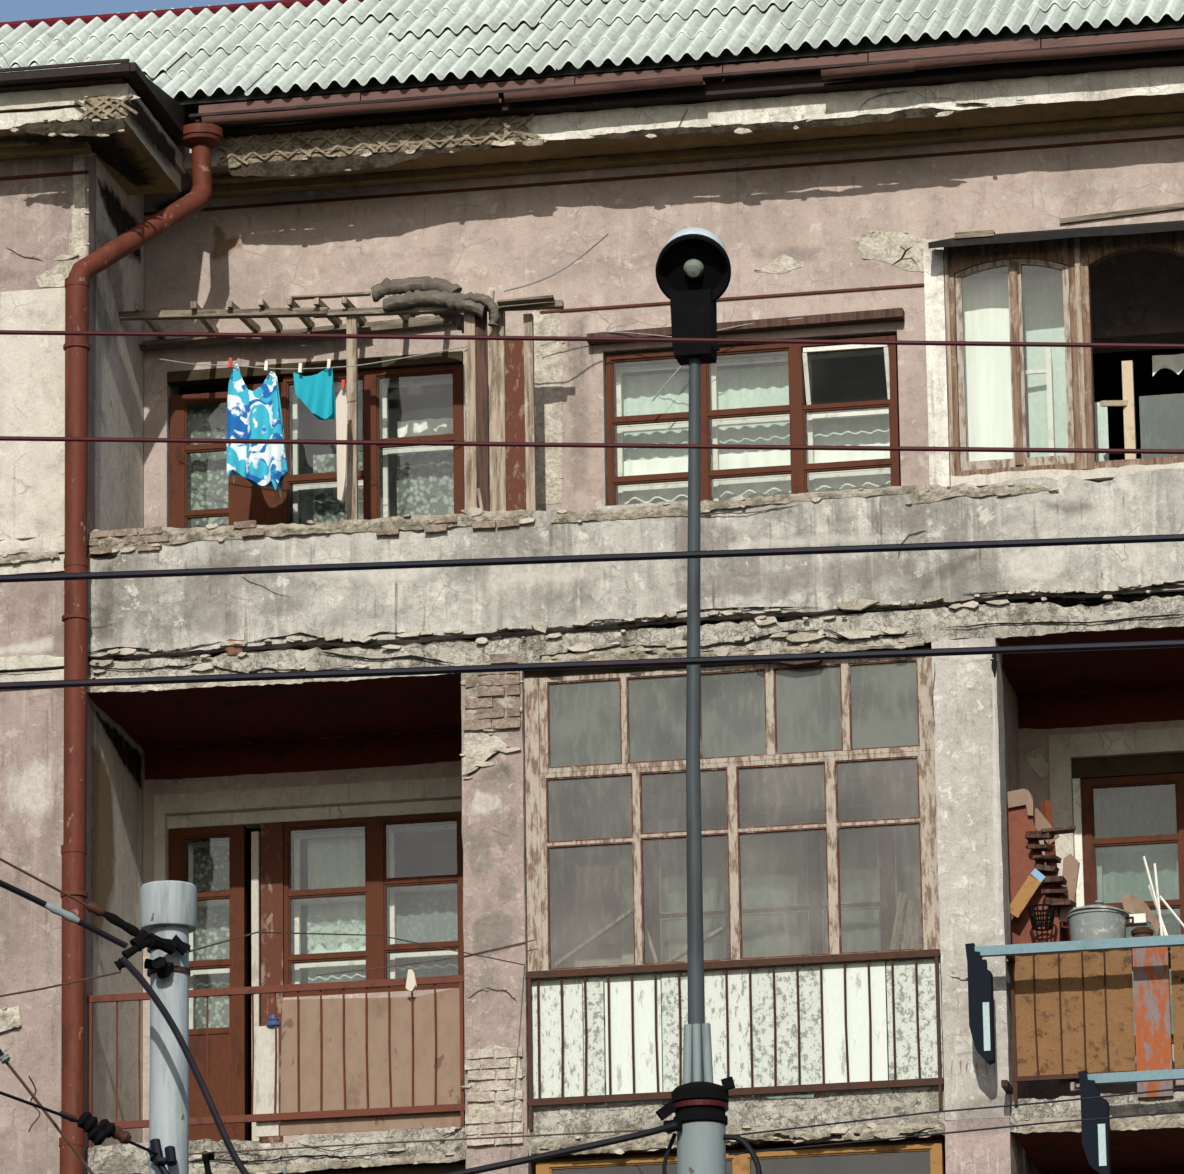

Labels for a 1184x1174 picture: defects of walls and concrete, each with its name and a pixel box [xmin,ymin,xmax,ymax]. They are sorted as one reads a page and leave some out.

spalling [590,106,961,139]
flaking render [217,113,548,177]
peeling [754,254,803,274]
peeling [850,230,944,272]
flaking render [754,616,778,625]
spalling [539,640,926,663]
spalling [990,654,998,677]
flaking render [88,653,524,776]
flaking render [0,1006,21,1032]
flaking render [189,1044,677,1174]
spalling [726,1123,942,1143]